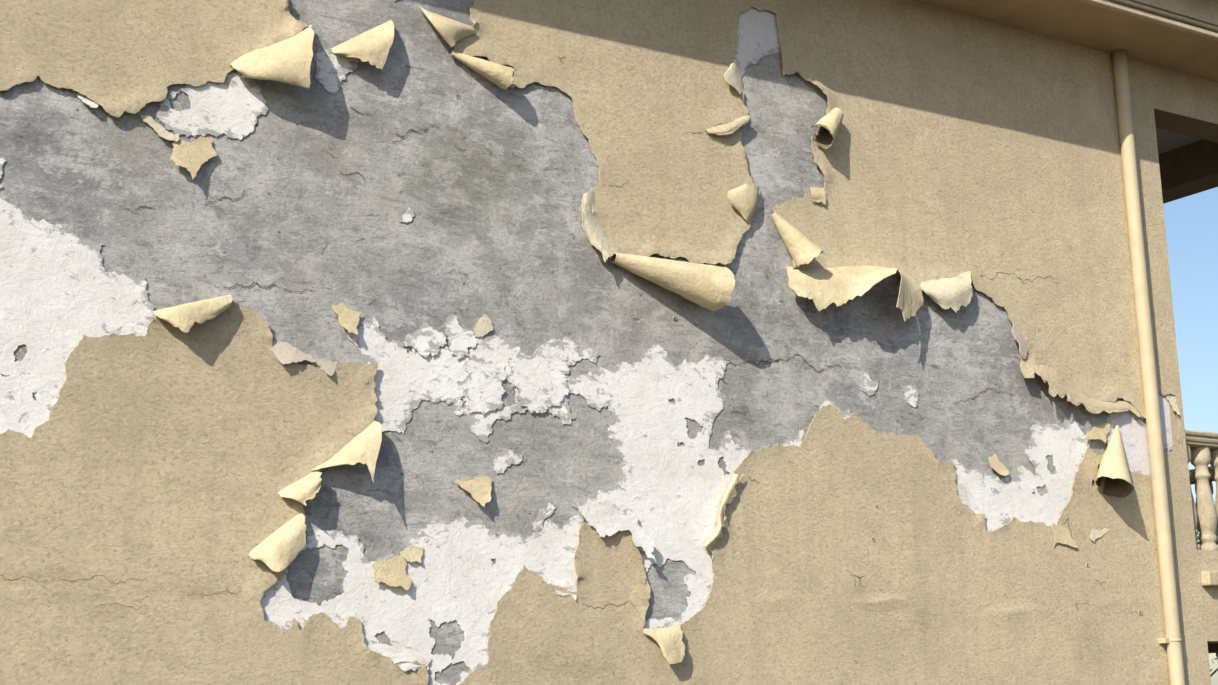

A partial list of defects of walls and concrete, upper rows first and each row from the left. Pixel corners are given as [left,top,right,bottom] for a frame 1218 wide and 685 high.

peeling [0,0,1151,548]
peeling [249,317,655,685]
peeling [565,344,753,664]